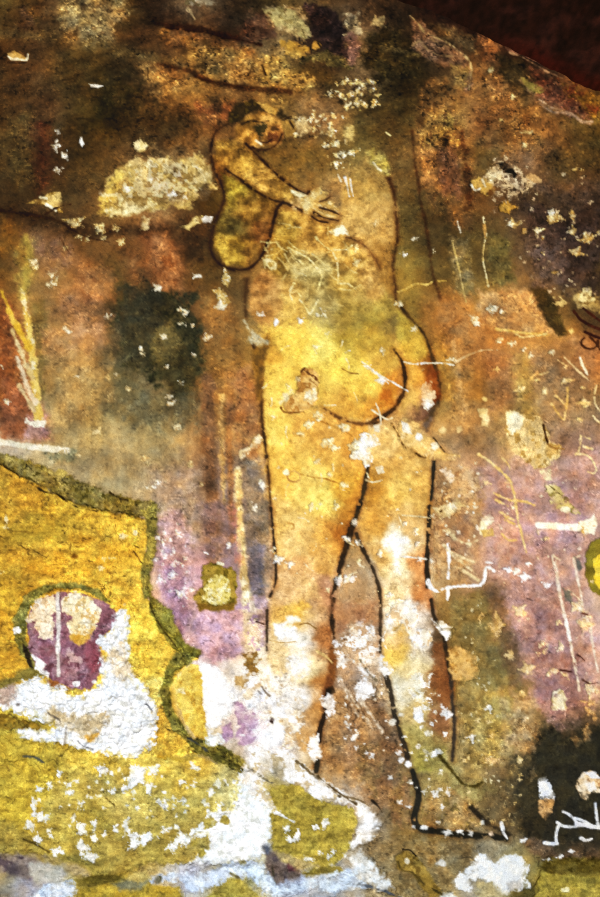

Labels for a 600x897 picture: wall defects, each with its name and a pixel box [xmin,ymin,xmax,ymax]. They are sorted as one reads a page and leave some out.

spalling [518,129,535,151]
peeling [25,137,219,252]
spalling [470,153,600,315]
spalling [169,421,183,432]
spalling [268,544,296,570]
spalling [340,517,364,548]
spalling [0,466,239,757]
spalling [233,650,265,694]
spalling [254,573,600,838]
damp [338,626,600,897]
spalling [259,782,359,884]